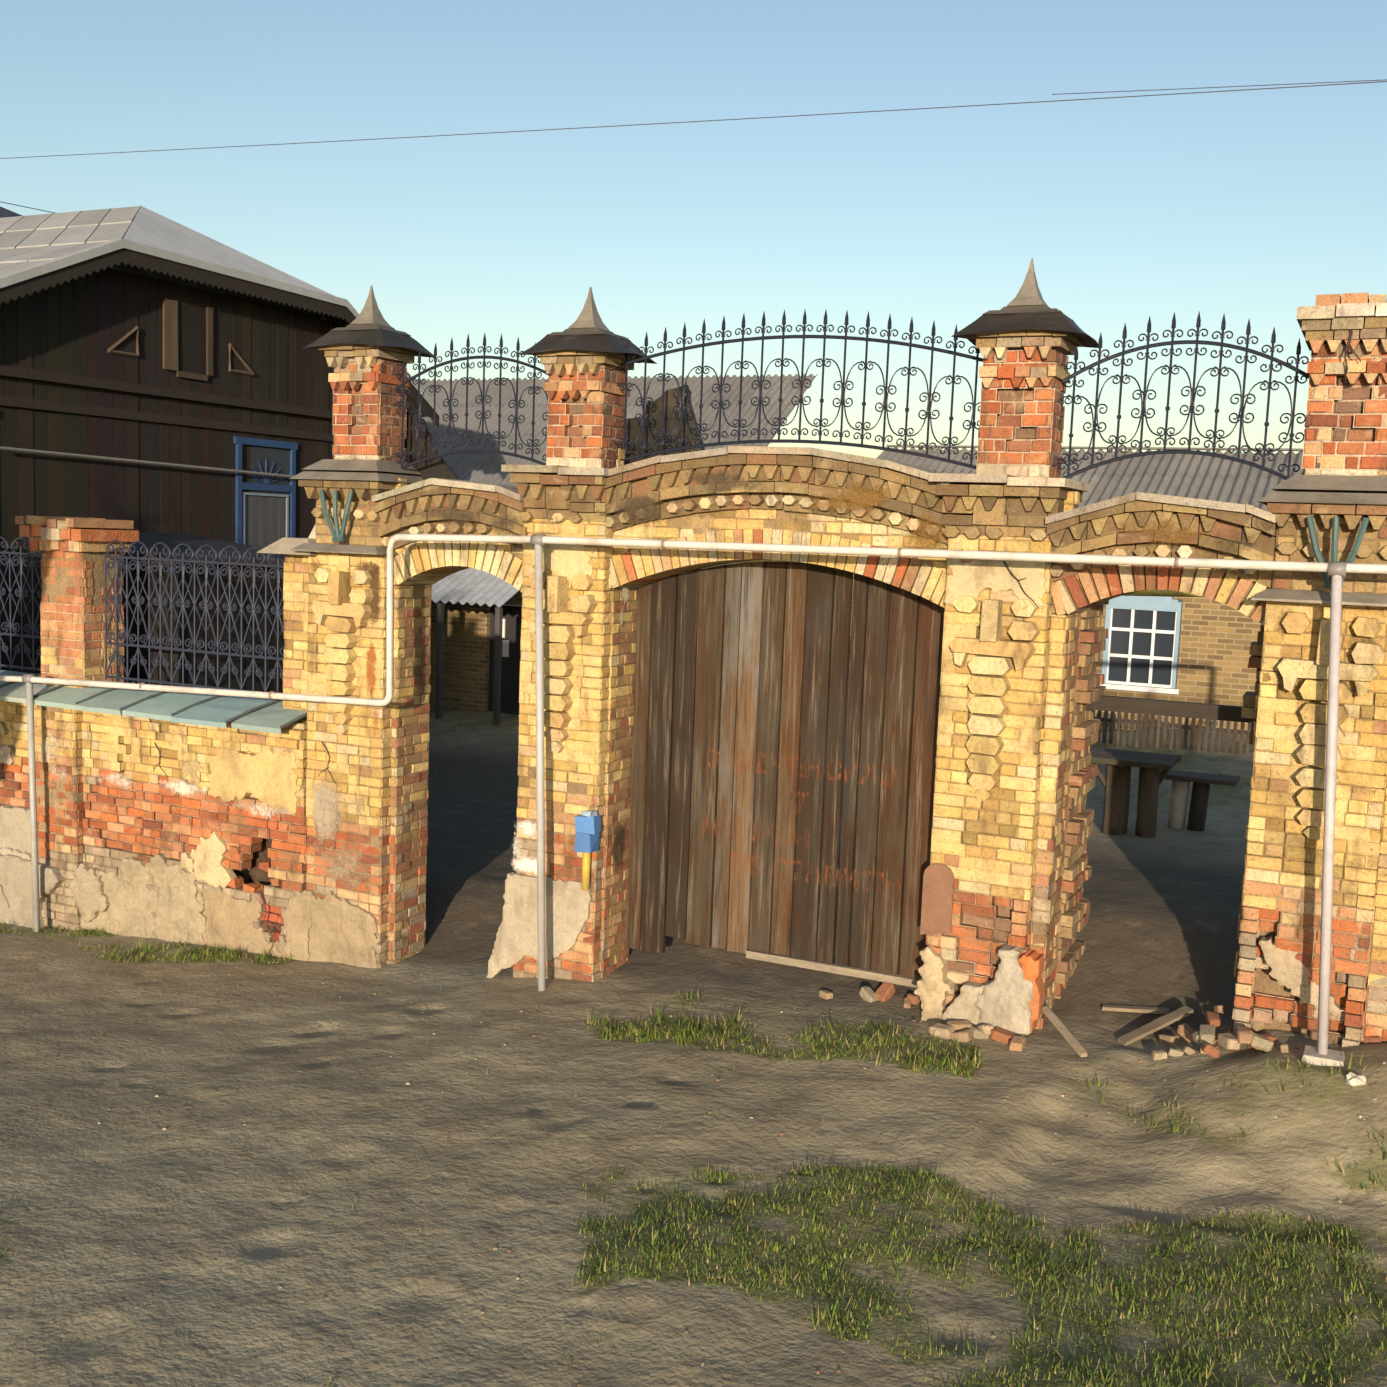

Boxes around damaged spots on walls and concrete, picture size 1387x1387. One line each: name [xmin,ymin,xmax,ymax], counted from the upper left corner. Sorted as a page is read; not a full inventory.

spalling [0,721,385,968]
spalling [859,885,1045,1051]
spalling [1151,907,1382,1061]